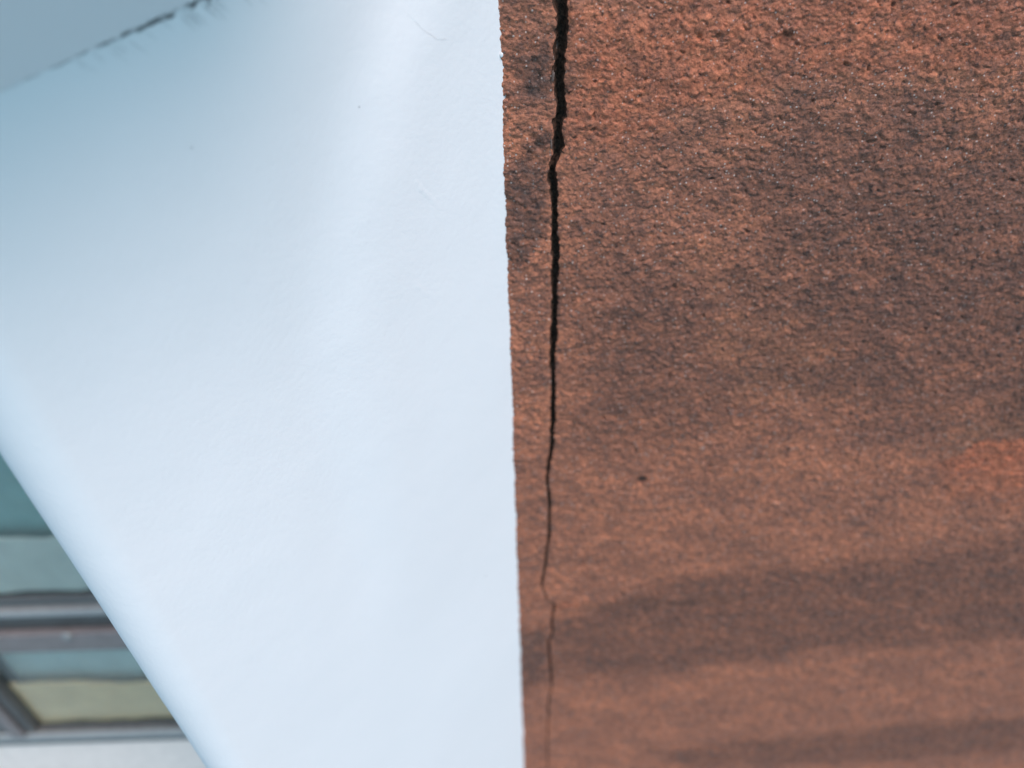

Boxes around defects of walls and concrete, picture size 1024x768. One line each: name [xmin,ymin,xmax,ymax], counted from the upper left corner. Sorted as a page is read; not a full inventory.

crack [540,0,572,768]